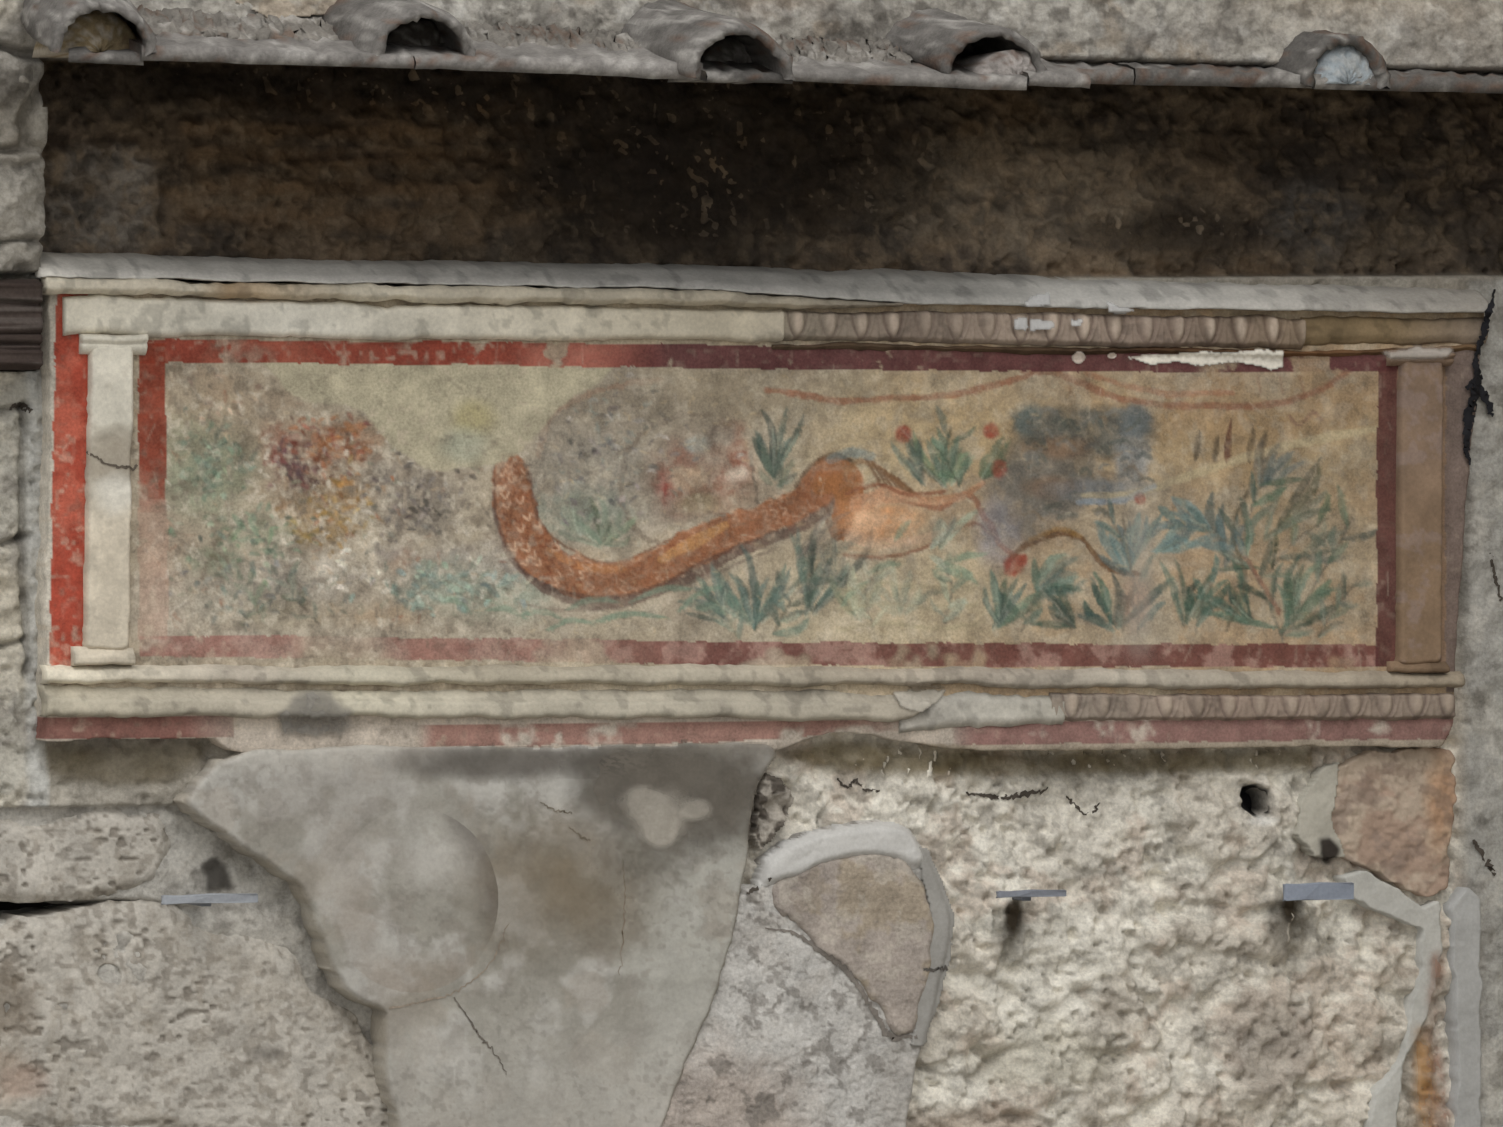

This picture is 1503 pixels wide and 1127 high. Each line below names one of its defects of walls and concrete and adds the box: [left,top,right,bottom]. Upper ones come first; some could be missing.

spalling [1014,293,1083,331]
spalling [1107,301,1132,314]
peeling [1072,352,1085,363]
peeling [1107,349,1283,370]
crack [1462,289,1496,465]
crack [86,451,138,471]
crack [966,787,1100,815]
spalling [1240,785,1269,815]
crack [389,924,509,1072]